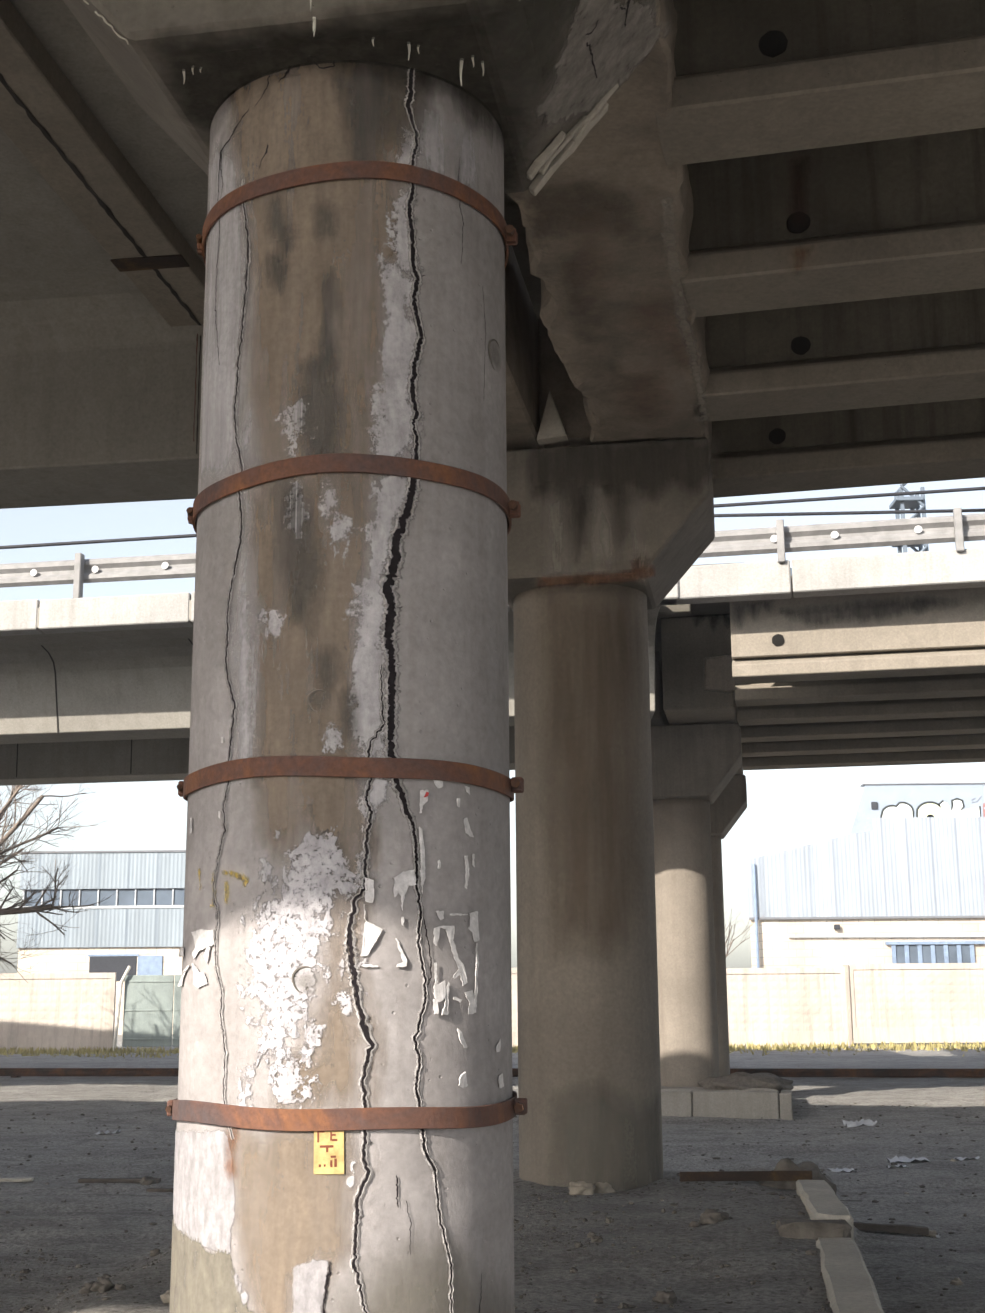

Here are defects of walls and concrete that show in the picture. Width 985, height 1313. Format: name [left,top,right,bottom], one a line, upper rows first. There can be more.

spalling [526,0,669,196]
leakage [167,0,530,477]
leakage [531,440,718,573]
crack [212,62,335,1140]
leakage [235,472,411,759]
crack [323,69,482,1313]
leakage [695,599,944,627]
peeling [360,780,443,967]
peeling [433,910,480,1015]
peeling [457,786,474,837]
peeling [464,854,475,889]
peeling [458,1072,468,1088]